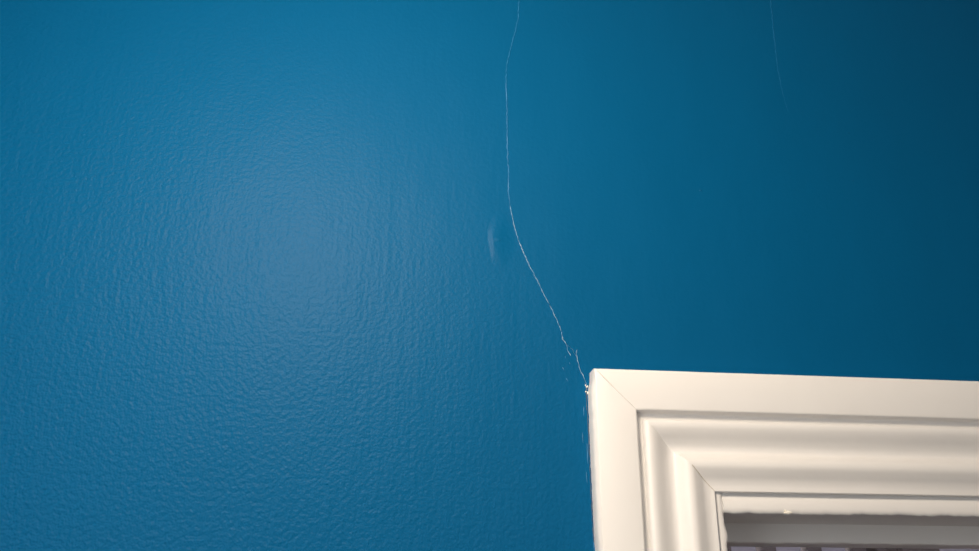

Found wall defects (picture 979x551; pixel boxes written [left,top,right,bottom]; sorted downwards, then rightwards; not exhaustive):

crack [505,0,635,408]